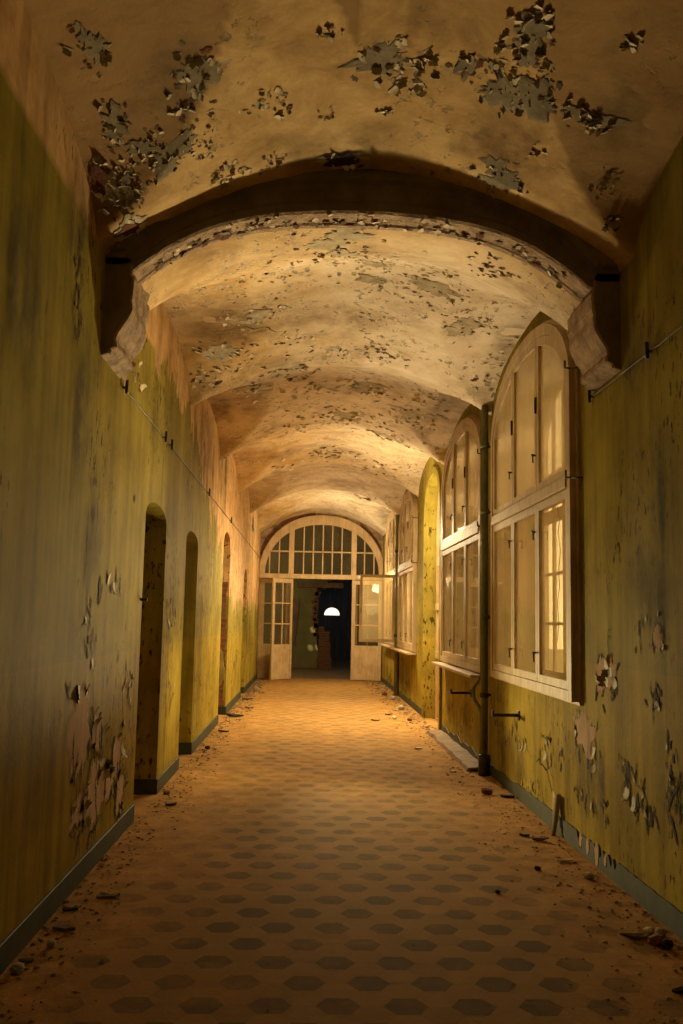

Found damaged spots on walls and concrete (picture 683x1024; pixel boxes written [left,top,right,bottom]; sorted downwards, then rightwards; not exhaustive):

peeling [62,21,113,78]
peeling [338,5,633,137]
peeling [619,35,643,53]
peeling [88,41,294,241]
spalling [312,152,371,171]
peeling [470,145,548,199]
peeling [155,213,568,452]
spalling [123,338,173,421]
peeling [264,446,396,480]
peeling [65,566,134,864]
peeling [594,652,620,712]
peeling [617,728,682,846]